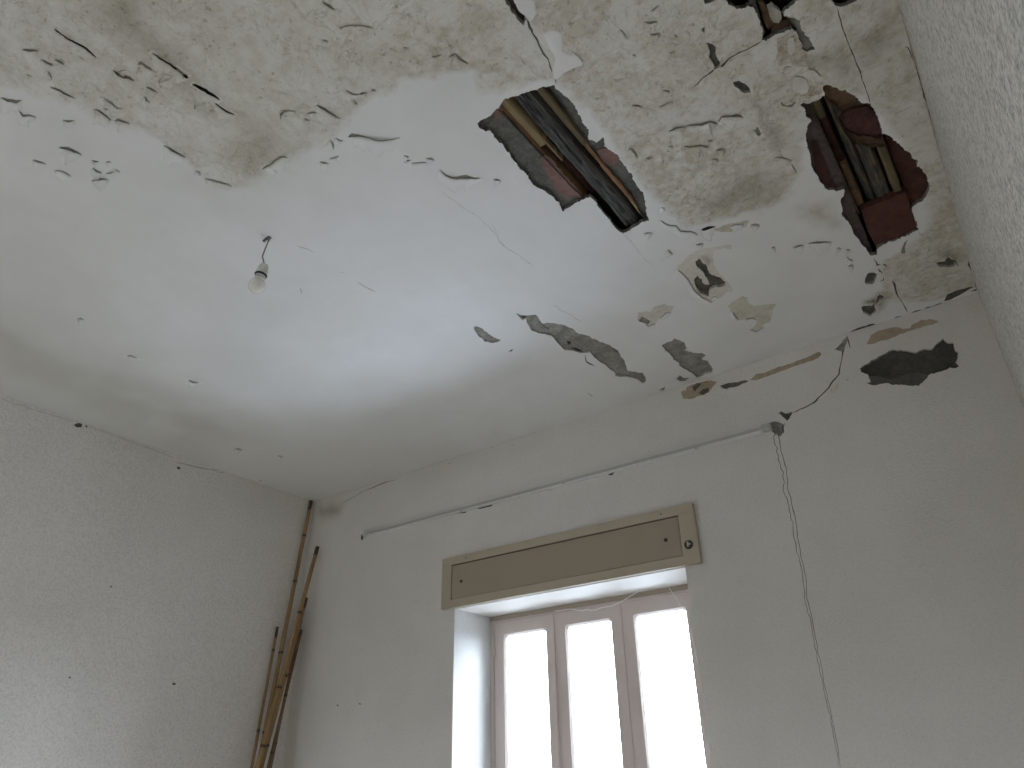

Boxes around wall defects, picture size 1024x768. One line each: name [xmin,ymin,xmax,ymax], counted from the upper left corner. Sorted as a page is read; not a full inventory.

peeling [701,0,825,121]
spalling [478,105,776,336]
peeling [793,155,930,275]
spalling [474,326,500,343]
spalling [517,314,646,383]
spalling [662,339,821,399]
spalling [860,319,959,386]
crack [772,259,977,768]